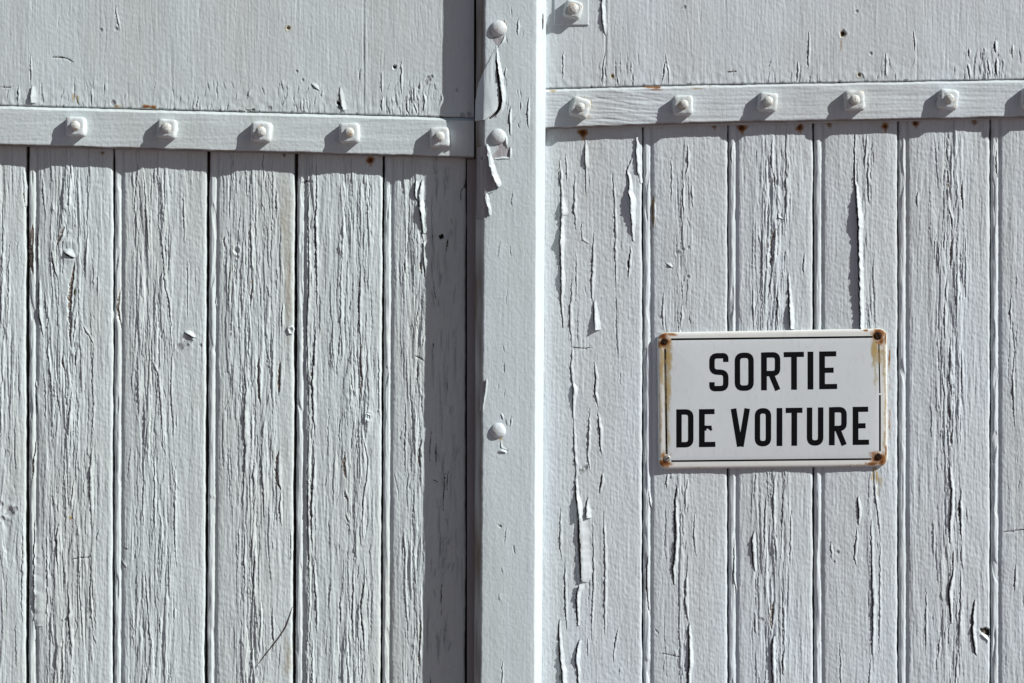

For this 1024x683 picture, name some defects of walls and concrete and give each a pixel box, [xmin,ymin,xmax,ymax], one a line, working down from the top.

peeling [460,35,512,219]
peeling [559,169,569,327]
peeling [593,301,601,330]
peeling [626,137,643,241]
peeling [853,135,865,329]
crack [0,166,115,683]
crack [121,164,190,683]
crack [242,163,370,683]
corrosion [658,333,677,467]
corrosion [850,329,890,466]
peeling [574,464,592,625]